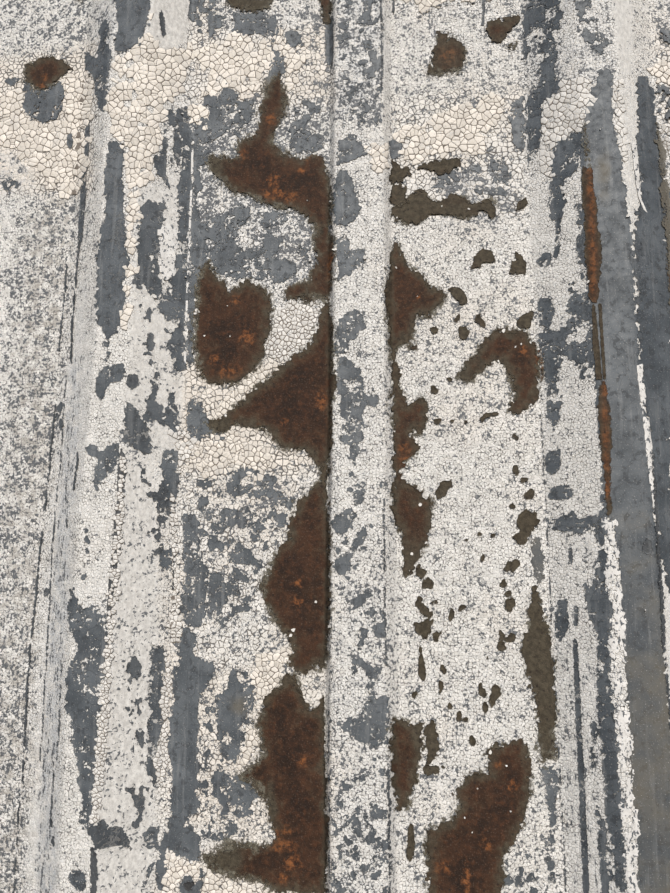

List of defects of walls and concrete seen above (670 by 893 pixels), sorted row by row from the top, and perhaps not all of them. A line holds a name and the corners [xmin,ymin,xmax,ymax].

crack [0,13,306,331]
crack [364,77,630,178]
peeling [507,0,564,169]
peeling [64,0,312,893]
corrosion [188,73,338,893]
peeling [330,305,390,792]
crack [385,768,393,893]
corrosion [386,716,445,812]
corrosion [382,241,545,681]
corrosion [406,585,560,893]
peeling [531,68,670,893]
crack [652,450,670,729]